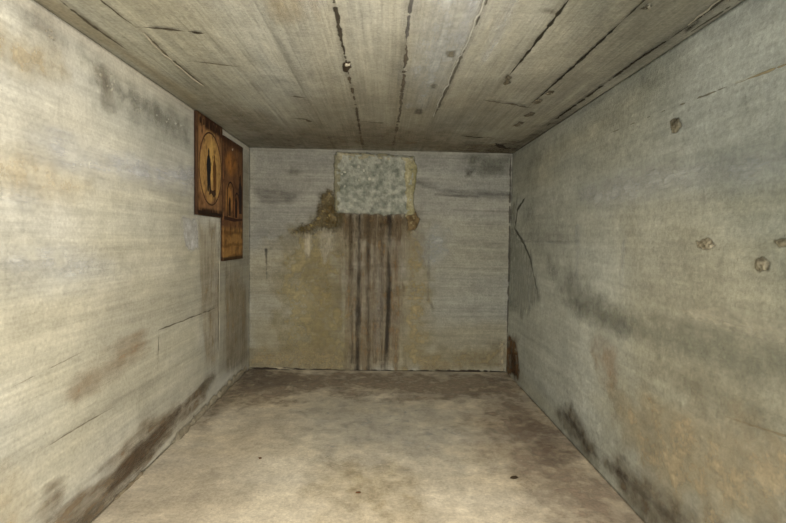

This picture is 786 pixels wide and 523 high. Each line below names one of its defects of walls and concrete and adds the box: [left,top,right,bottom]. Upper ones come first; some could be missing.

crack [333,0,413,145]
crack [433,0,488,117]
crack [486,0,645,108]
crack [547,0,730,126]
crack [611,62,786,133]
spalling [293,190,342,234]
spalling [405,212,420,231]
damp [235,226,685,523]
damp [53,376,214,523]